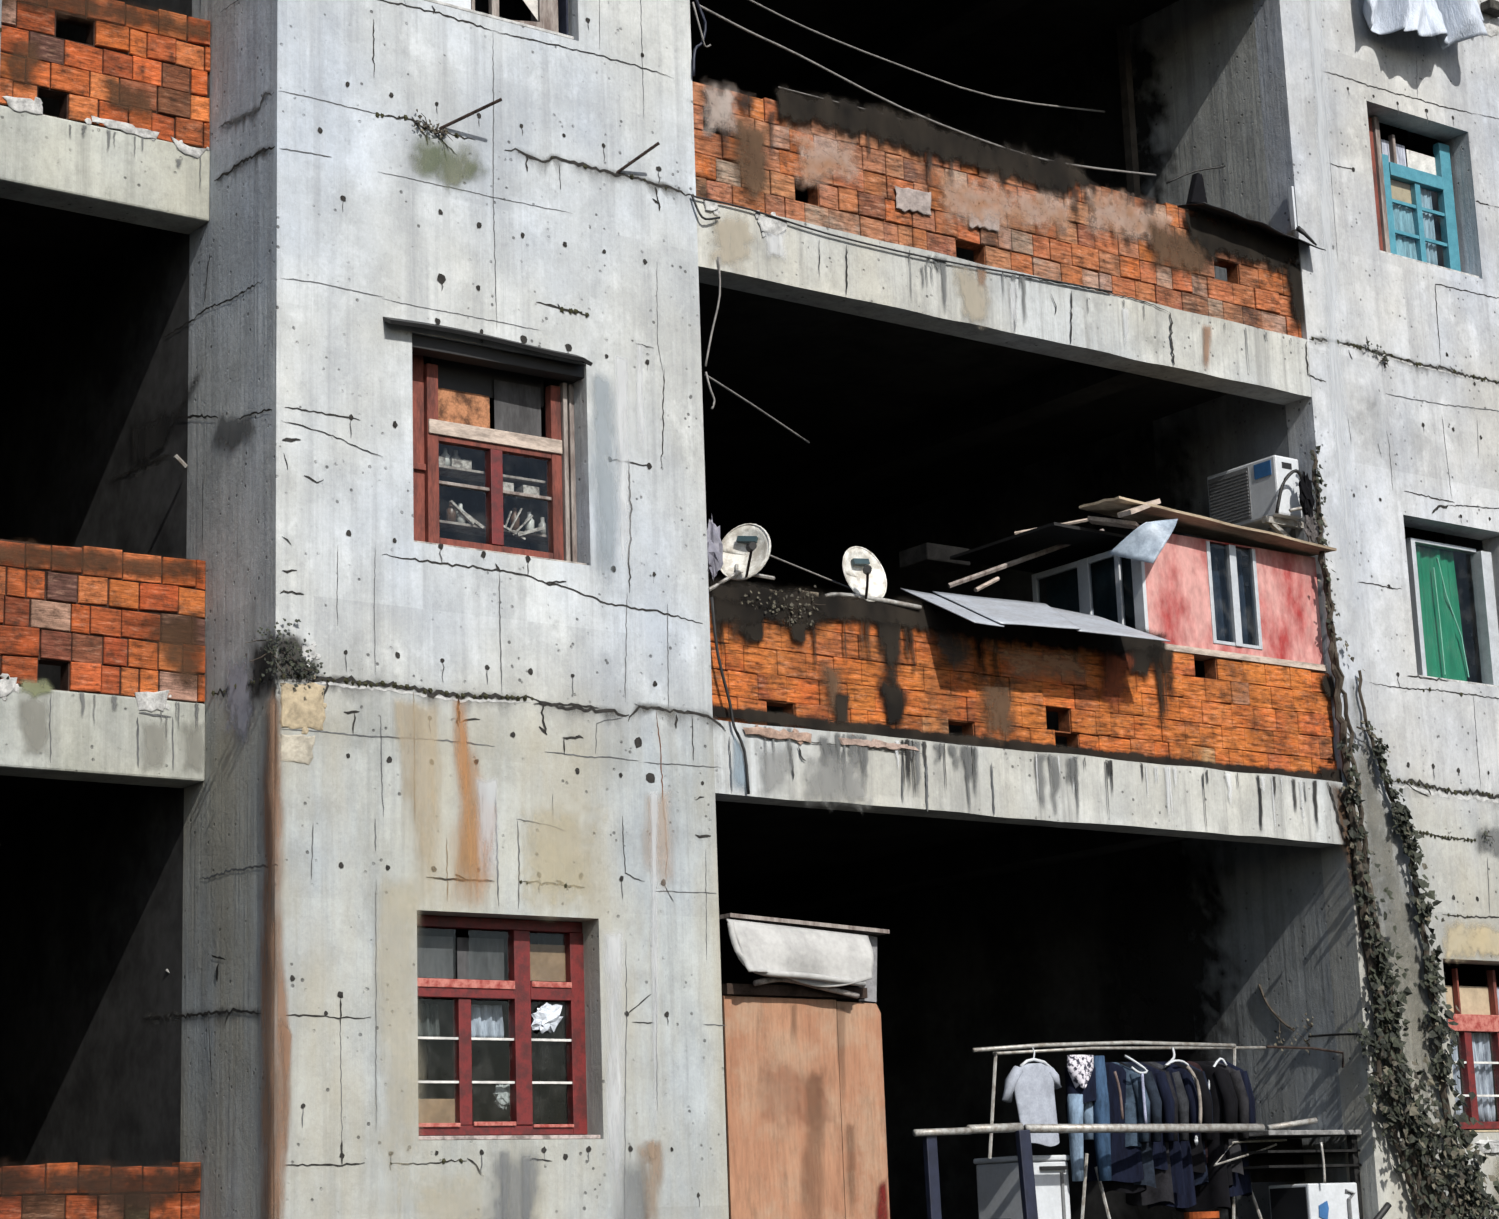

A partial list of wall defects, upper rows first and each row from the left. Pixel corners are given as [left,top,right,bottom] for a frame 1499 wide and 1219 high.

crack [372,0,672,78]
crack [375,112,694,211]
water stain [706,85,753,143]
spalling [895,186,932,216]
water stain [920,150,1172,248]
crack [1306,284,1499,412]
spalling [278,642,327,765]
water stain [879,639,1016,804]
crack [200,673,726,900]
rust [457,706,493,876]
water stain [1257,766,1342,829]
rust [261,698,291,1219]